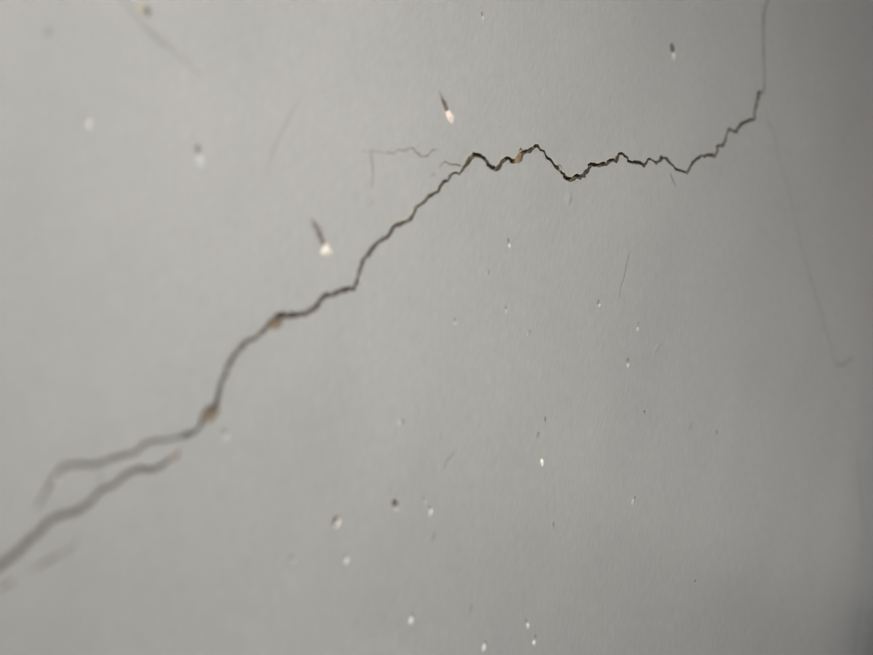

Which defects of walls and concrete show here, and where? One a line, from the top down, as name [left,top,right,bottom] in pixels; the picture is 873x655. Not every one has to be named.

crack [0,0,769,570]